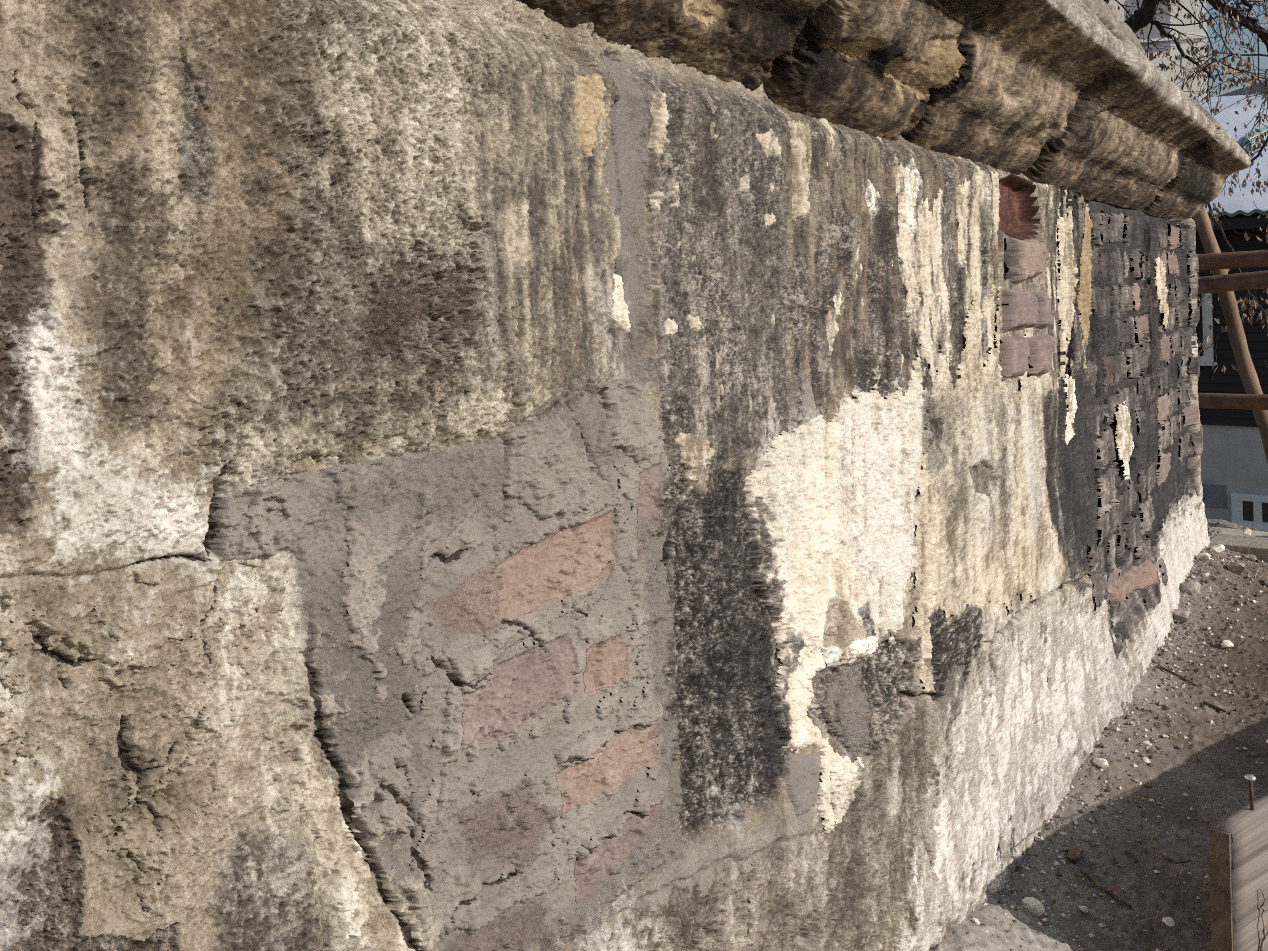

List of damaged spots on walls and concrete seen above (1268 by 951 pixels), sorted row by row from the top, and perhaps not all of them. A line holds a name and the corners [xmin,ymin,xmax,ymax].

peeling [648,74,670,157]
peeling [664,291,726,335]
leakage [643,0,1005,602]
flaking render [740,149,1203,848]
flaking render [0,583,55,785]
flaking render [168,391,624,951]
leakage [730,606,792,790]
crack [898,691,942,702]
leakage [0,756,59,862]
leakage [214,832,325,951]
crack [304,662,420,951]
crack [379,759,536,923]